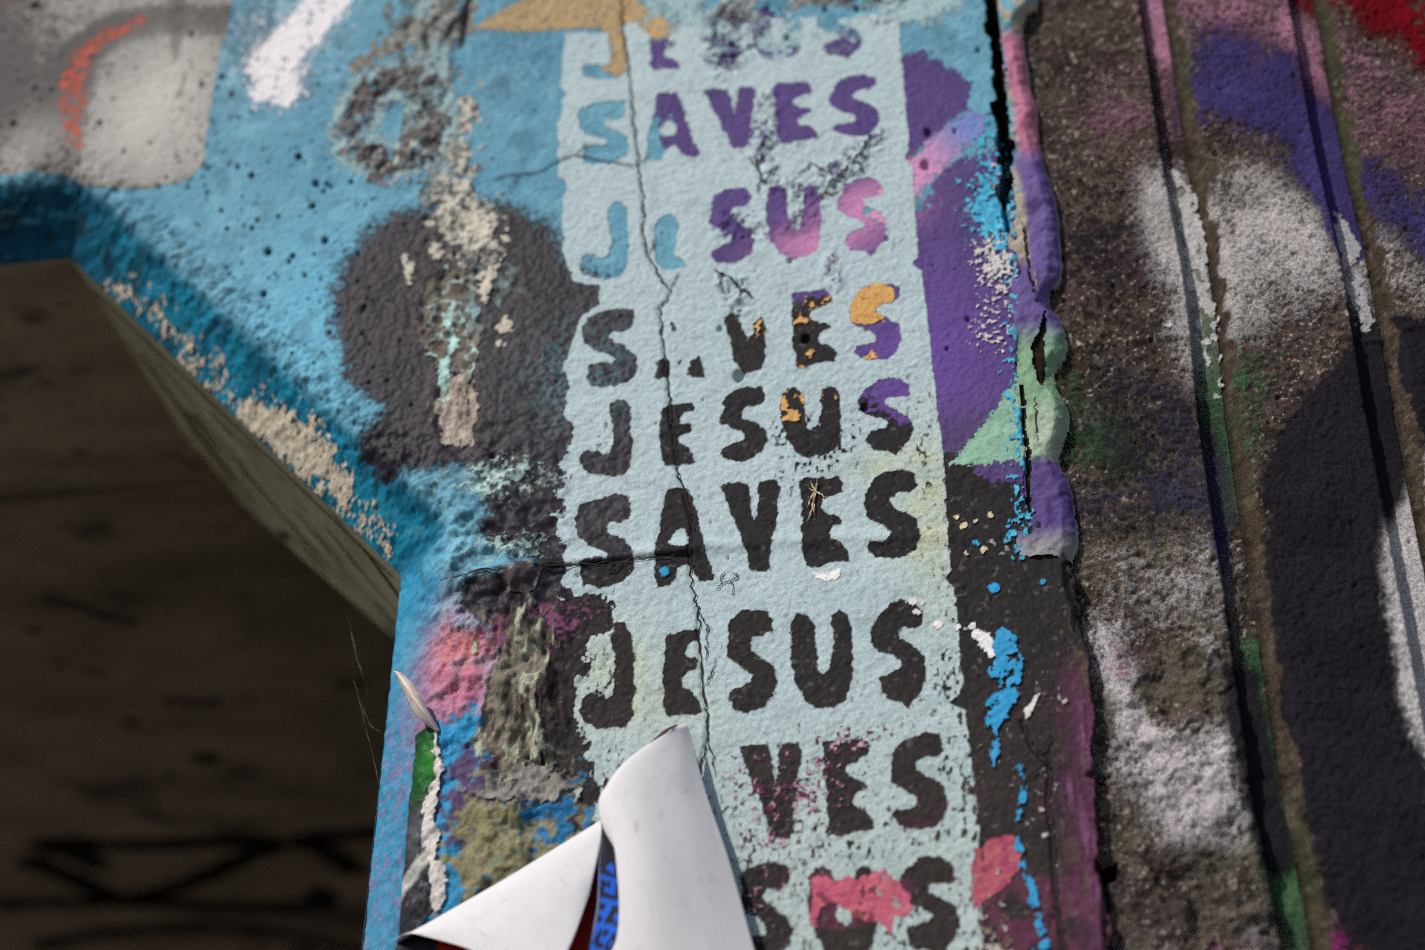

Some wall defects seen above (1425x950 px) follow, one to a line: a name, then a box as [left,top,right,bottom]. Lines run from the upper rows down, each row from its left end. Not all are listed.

peeling [104,272,398,562]
peeling [401,201,513,448]
crack [440,0,738,774]
crack [714,268,754,298]
crack [983,0,1047,513]